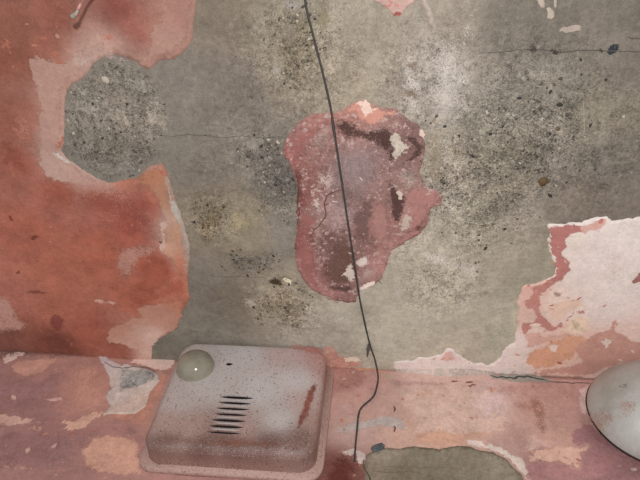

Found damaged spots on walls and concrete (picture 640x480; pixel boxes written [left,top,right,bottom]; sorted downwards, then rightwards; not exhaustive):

spalling [263,0,331,89]
crack [487,37,640,55]
peeling [0,0,227,432]
peeling [220,77,594,335]
peeling [323,216,640,414]
crack [490,374,588,384]
spalling [342,424,640,480]